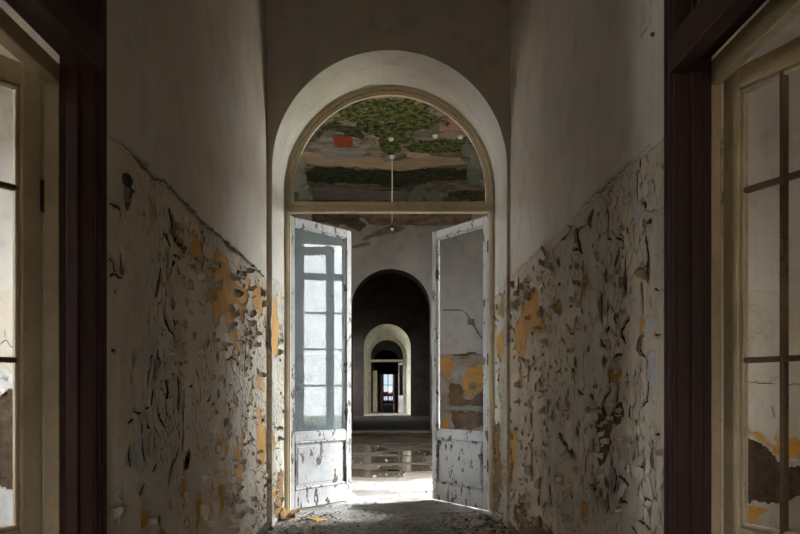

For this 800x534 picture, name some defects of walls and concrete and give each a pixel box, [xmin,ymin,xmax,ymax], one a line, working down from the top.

peeling [108,131,285,534]
flaking render [440,354,483,431]
peeling [490,201,629,534]
flaking render [748,422,800,524]